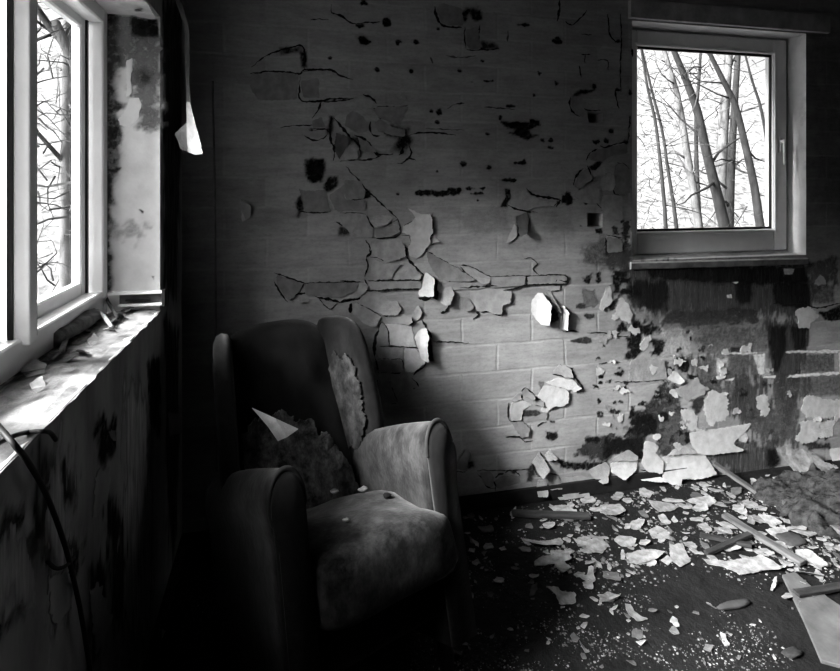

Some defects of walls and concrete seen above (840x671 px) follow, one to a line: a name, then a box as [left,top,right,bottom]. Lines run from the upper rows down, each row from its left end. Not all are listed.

water stain [94,412,117,464]
water stain [107,0,182,567]
crack [311,5,380,24]
crack [347,167,398,219]
peeling [250,44,512,404]
crack [409,128,462,136]
crack [557,0,633,140]
peeling [457,285,751,511]
water stain [574,238,840,473]
peeling [767,395,840,472]
peeling [795,305,840,328]
water stain [0,439,128,646]